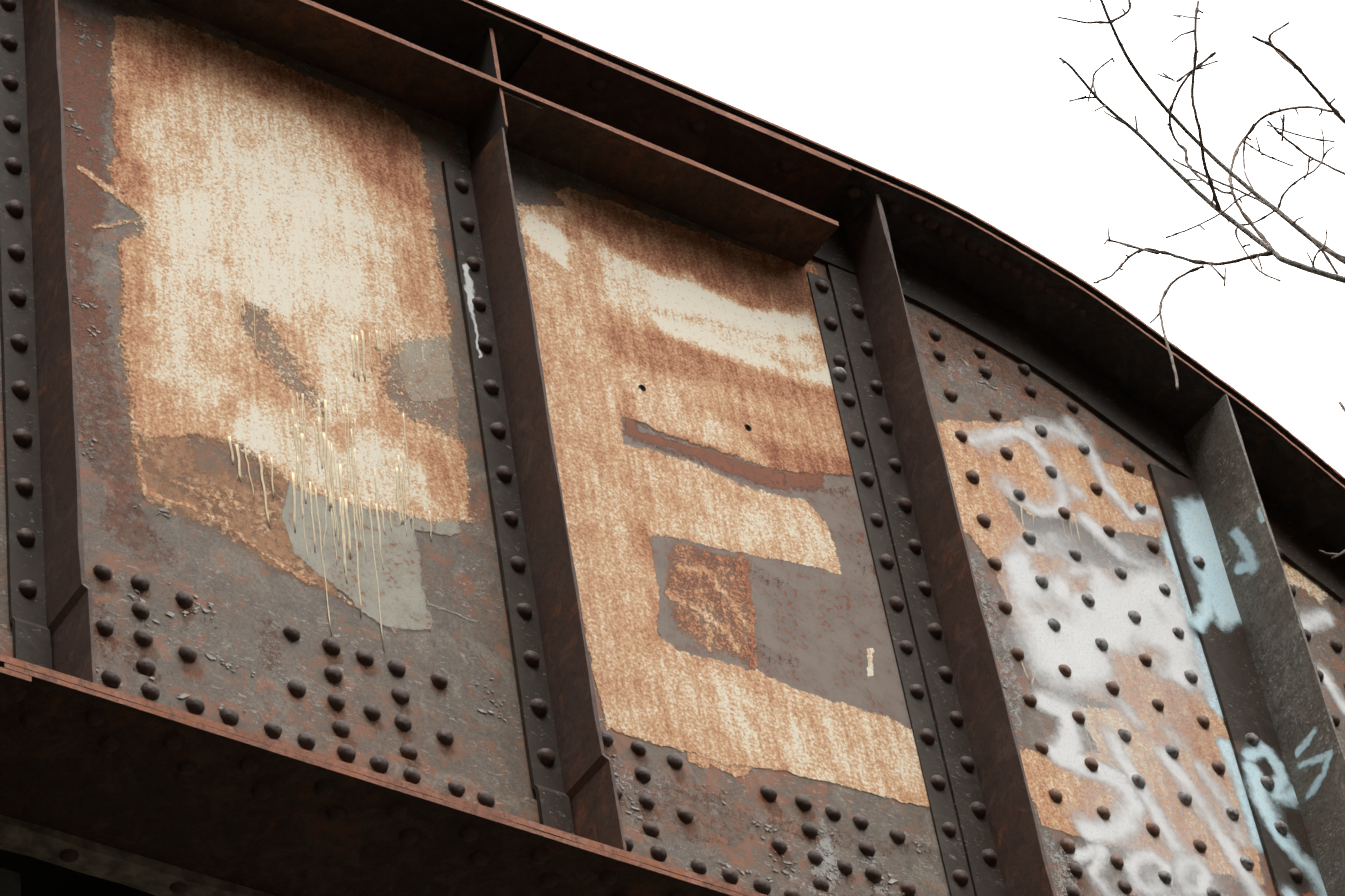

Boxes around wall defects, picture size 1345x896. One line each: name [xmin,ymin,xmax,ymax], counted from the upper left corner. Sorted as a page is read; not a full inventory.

rust [58,4,337,596]
rust [623,417,848,496]
rust [664,542,798,671]
rust [641,752,931,867]
rust [1113,867,1146,896]